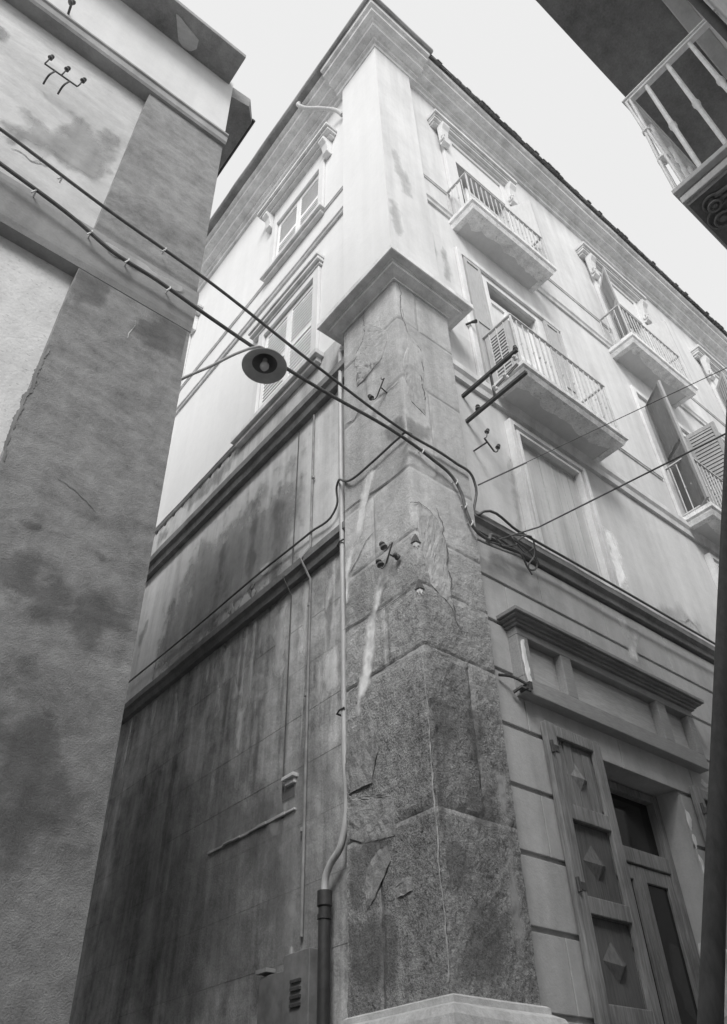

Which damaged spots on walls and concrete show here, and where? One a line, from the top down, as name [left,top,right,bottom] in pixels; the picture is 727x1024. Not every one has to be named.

water stain [8,119,118,177]
water stain [345,470,374,603]
water stain [300,580,309,654]
water stain [319,650,337,691]
water stain [357,578,388,708]